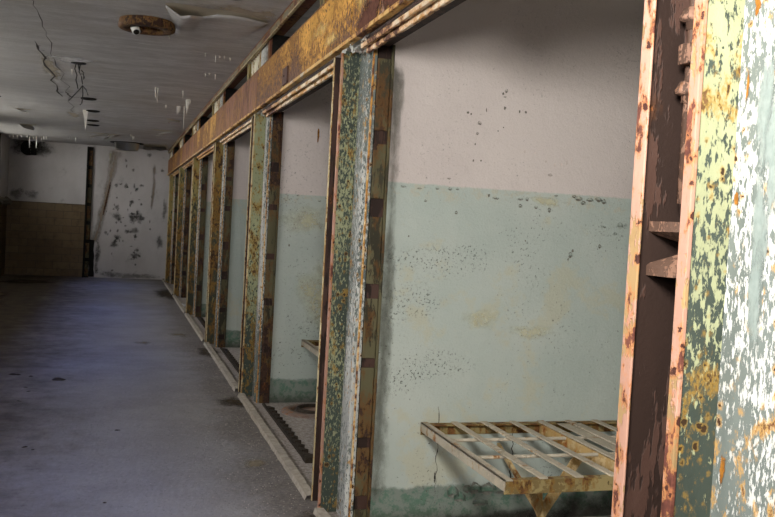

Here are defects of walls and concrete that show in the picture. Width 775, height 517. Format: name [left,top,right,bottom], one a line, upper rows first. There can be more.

crack [33,1,79,117]
peeling [165,3,268,43]
water stain [93,151,163,265]